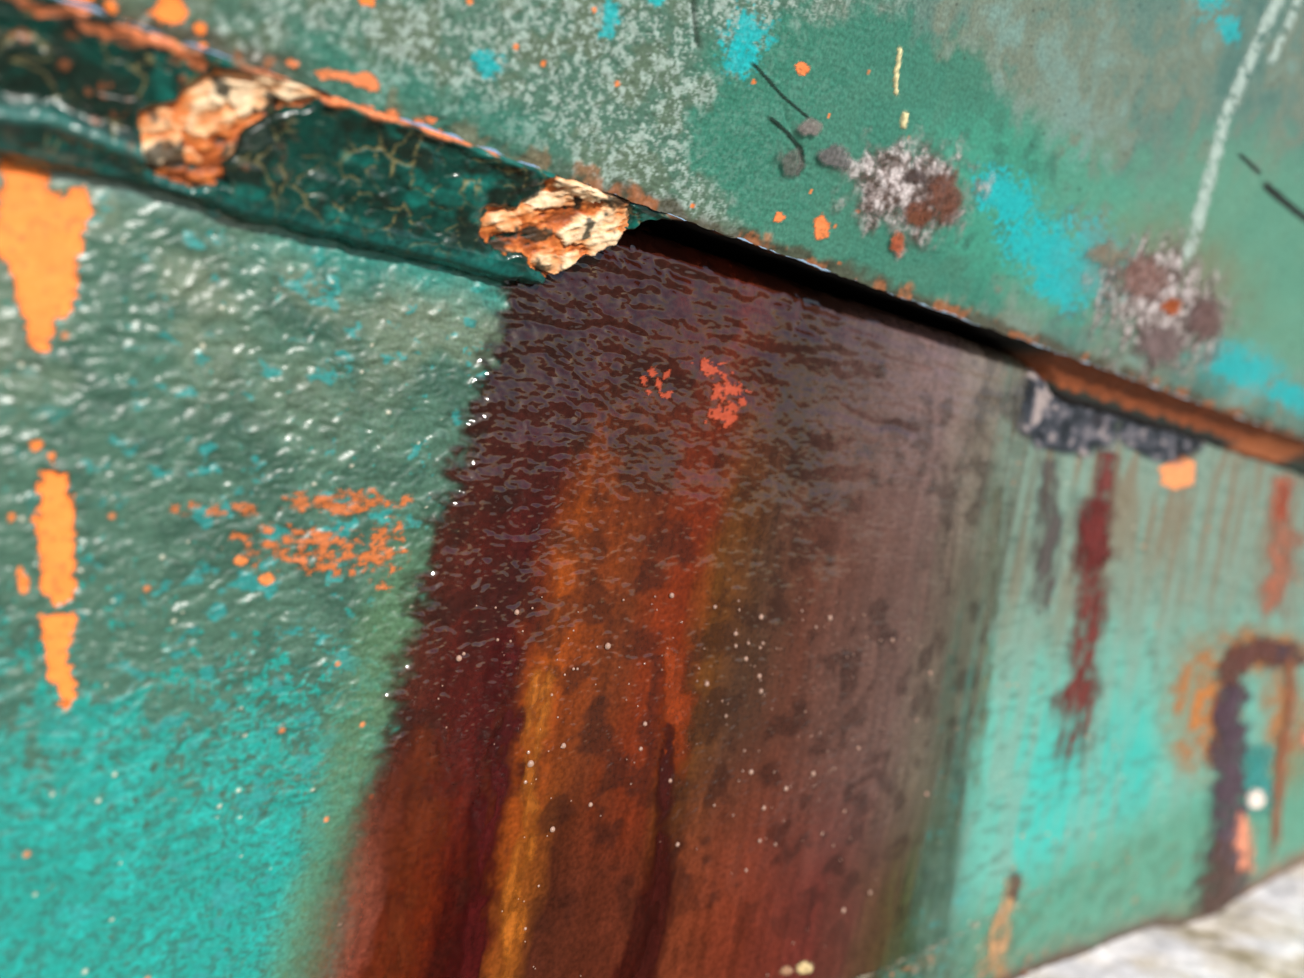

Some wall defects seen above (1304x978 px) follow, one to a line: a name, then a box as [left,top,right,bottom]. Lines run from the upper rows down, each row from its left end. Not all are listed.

peeling [0,160,94,352]
peeling [17,440,78,710]
rust [325,228,1021,978]
rust [1035,459,1063,607]
rust [1052,452,1117,760]
rust [1174,634,1304,919]